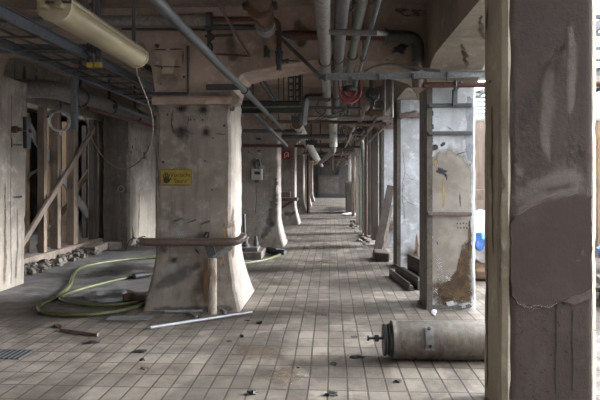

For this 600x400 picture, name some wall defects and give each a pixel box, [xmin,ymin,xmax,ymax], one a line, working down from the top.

peeling [510,193,593,309]